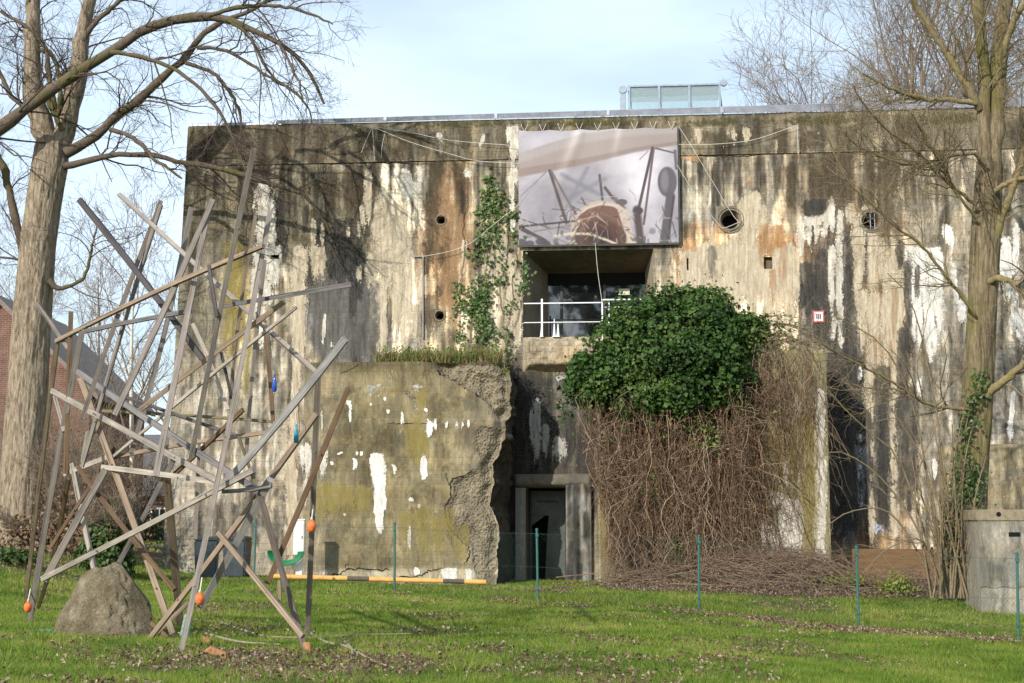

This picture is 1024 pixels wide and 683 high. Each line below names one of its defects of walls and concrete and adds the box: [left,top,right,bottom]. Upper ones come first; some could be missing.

damp [250,115,662,560]
damp [671,111,977,546]
peeling [298,441,397,534]
crack [331,470,483,578]
spalling [368,363,510,579]